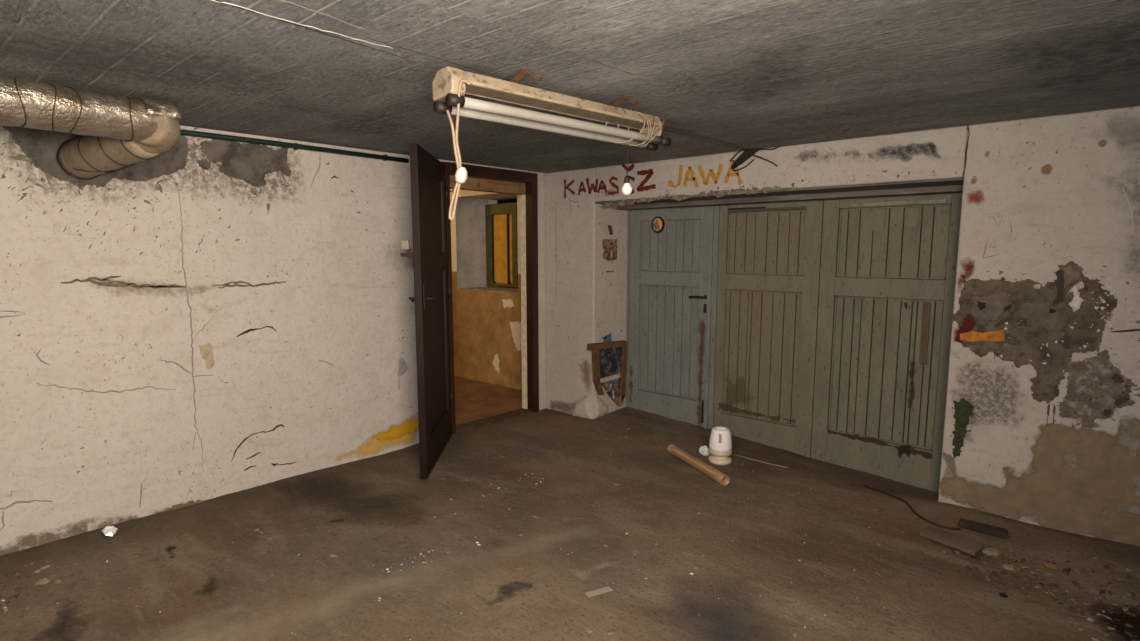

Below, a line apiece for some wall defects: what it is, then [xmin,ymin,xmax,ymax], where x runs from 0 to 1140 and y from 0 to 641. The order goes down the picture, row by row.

flaking render [0,126,292,255]
crack [34,182,285,467]
crack [231,424,297,471]
damp [338,417,419,460]
flaking render [940,254,1140,547]